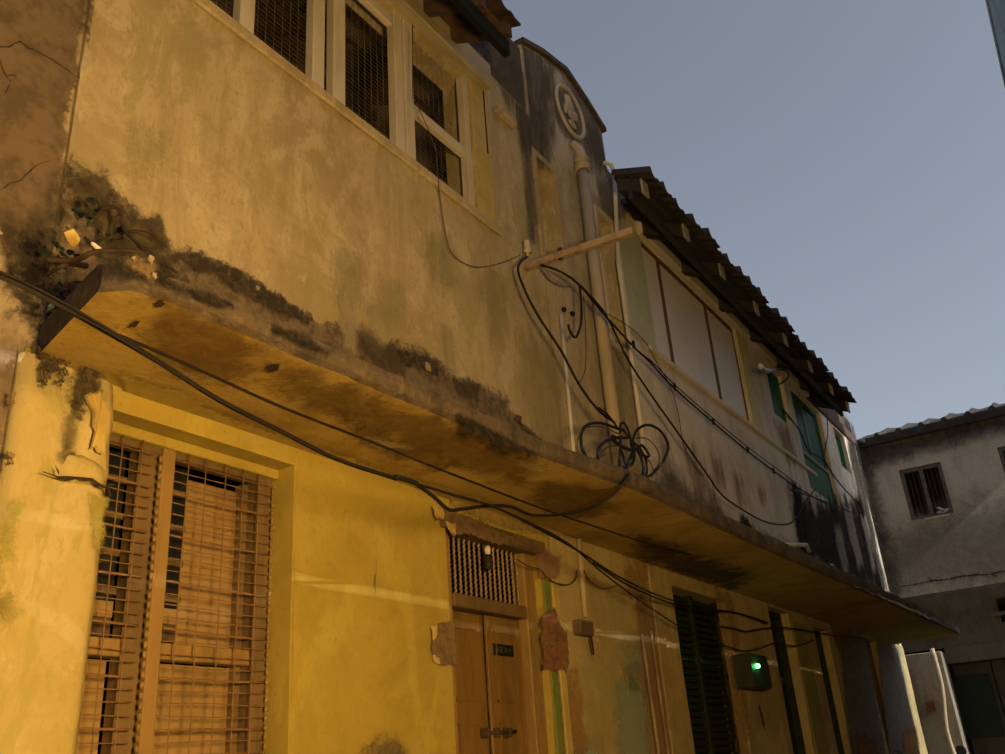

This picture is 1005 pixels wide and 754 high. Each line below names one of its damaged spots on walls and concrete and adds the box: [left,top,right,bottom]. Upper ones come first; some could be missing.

crack [0,41,80,94]
leakage [0,164,543,460]
leakage [277,370,535,484]
leakage [787,416,1005,595]
crack [898,571,1005,587]
peeling [430,621,457,666]
spalling [541,607,587,754]